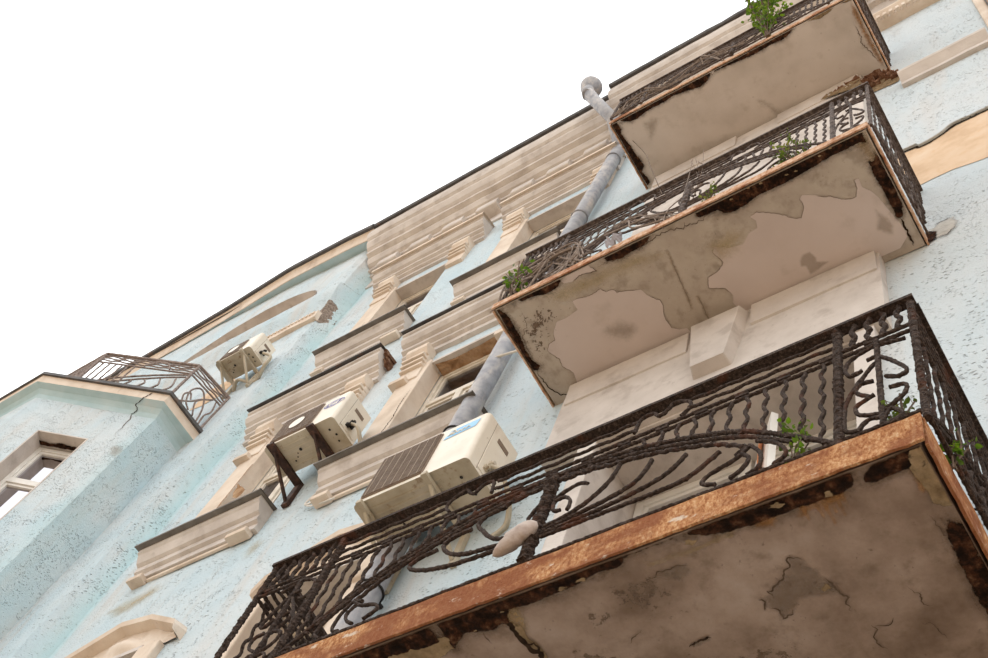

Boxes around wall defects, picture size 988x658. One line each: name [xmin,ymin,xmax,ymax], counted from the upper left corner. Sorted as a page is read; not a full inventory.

spalling [612,29,792,185]
spalling [821,67,900,100]
peeling [696,133,907,310]
crack [483,622,548,658]
spalling [349,447,952,658]
spalling [946,520,988,614]